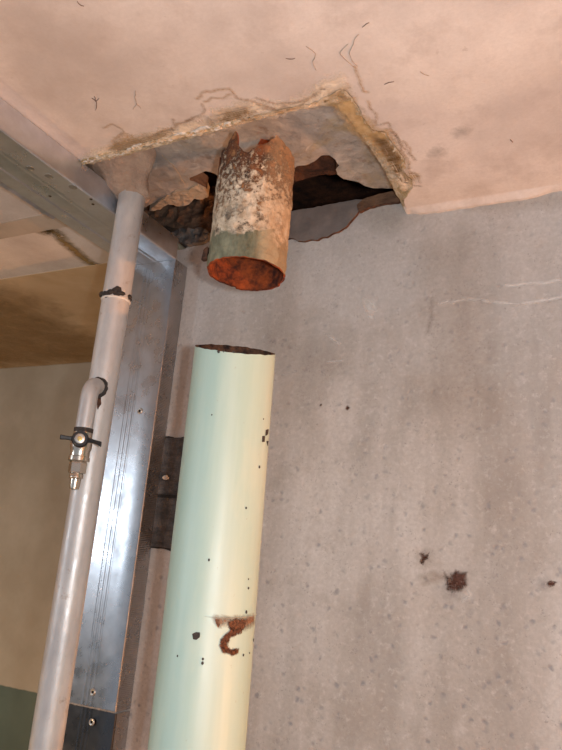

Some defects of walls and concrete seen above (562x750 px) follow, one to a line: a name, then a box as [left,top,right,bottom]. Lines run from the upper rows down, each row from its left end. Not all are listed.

crack [340,23,368,68]
water stain [81,78,415,189]
spalling [85,89,413,248]
rust [445,571,467,591]